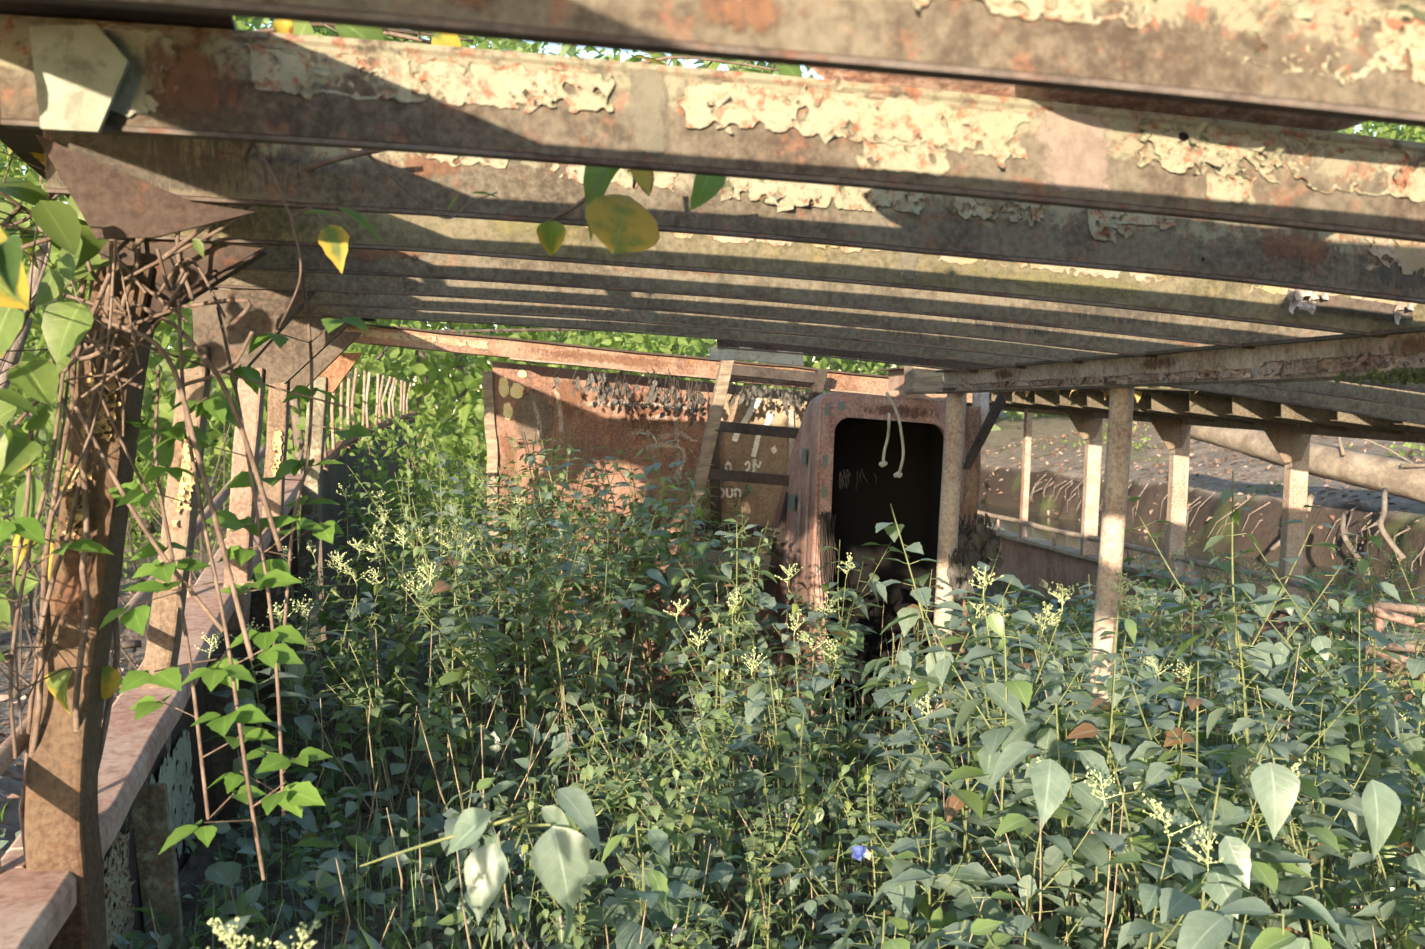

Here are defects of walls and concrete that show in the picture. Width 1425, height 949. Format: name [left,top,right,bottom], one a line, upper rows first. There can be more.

peeling [913,0,930,10]
peeling [983,0,1153,30]
peeling [1221,0,1425,85]
peeling [244,43,614,114]
peeling [677,79,1031,176]
peeling [1134,119,1425,206]
peeling [721,177,925,215]
peeling [1087,209,1176,244]
peeling [1364,236,1425,277]
corrosion [551,379,592,417]
corrosion [621,393,689,435]